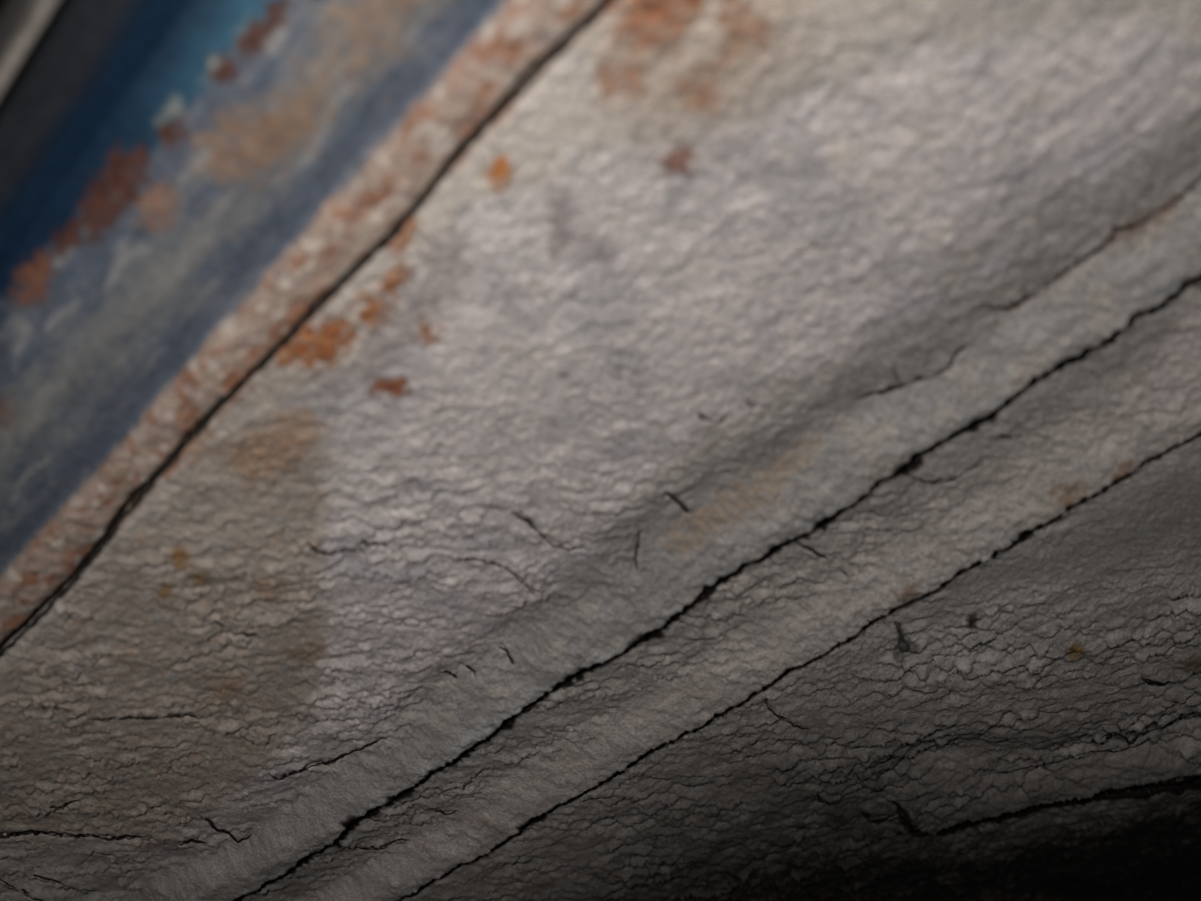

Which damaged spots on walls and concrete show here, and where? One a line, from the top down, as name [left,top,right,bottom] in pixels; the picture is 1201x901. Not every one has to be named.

rust [212,0,286,80]
rust [599,0,705,96]
rust [661,148,693,172]
rust [17,147,148,304]
crack [970,177,1201,312]
crack [0,0,614,657]
rust [278,264,412,366]
rust [371,378,411,396]
crack [234,276,1201,901]
crack [41,706,204,721]
crack [0,800,149,841]
crack [180,816,253,846]